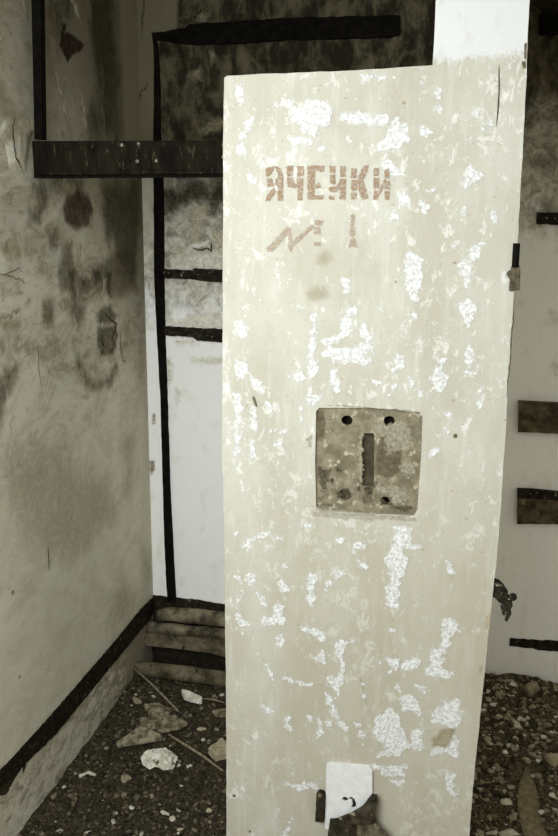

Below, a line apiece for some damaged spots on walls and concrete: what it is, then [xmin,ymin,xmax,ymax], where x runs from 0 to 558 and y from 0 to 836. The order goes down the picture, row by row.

peeling [274,98,434,177]
leakage [45,181,139,387]
peeling [403,251,424,322]
peeling [232,360,289,462]
peeling [287,278,376,393]
peeling [372,353,450,398]
peeling [456,298,485,375]
corrosion [318,467,412,512]
peeling [233,572,286,648]
peeling [305,570,346,607]
peeling [384,526,424,608]
peeling [297,617,469,788]